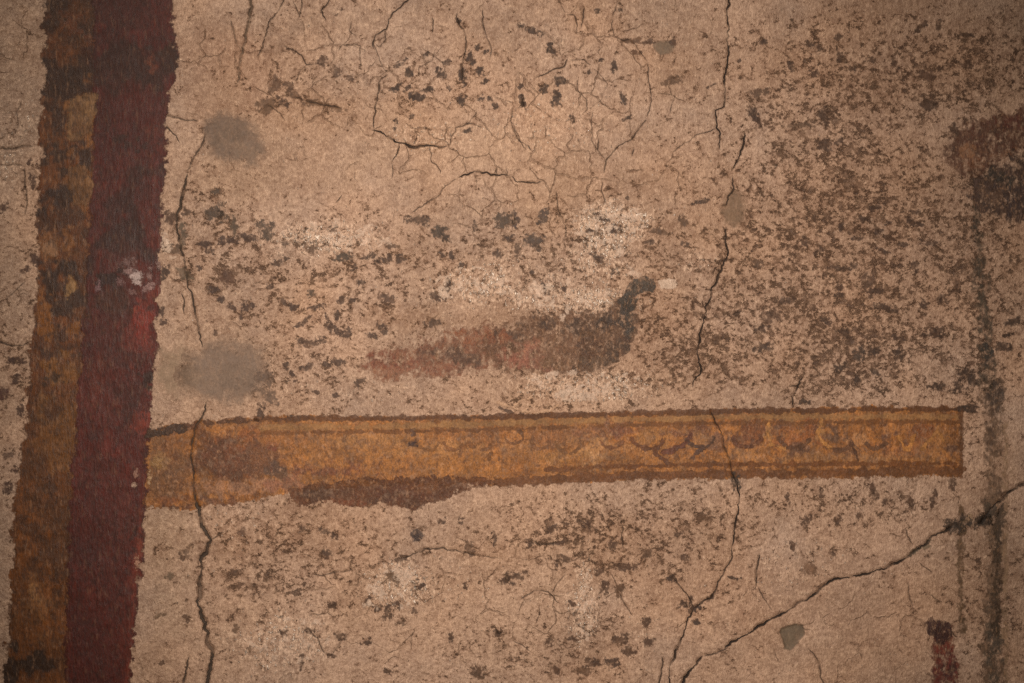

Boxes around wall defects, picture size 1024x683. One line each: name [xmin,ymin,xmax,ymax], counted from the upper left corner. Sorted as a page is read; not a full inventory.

crack [372,0,409,47]
crack [432,11,492,76]
crack [167,116,205,346]
crack [373,76,540,212]
crack [597,73,651,170]
crack [678,0,746,385]
crack [182,404,214,683]
crack [658,414,951,683]
crack [976,483,1024,525]